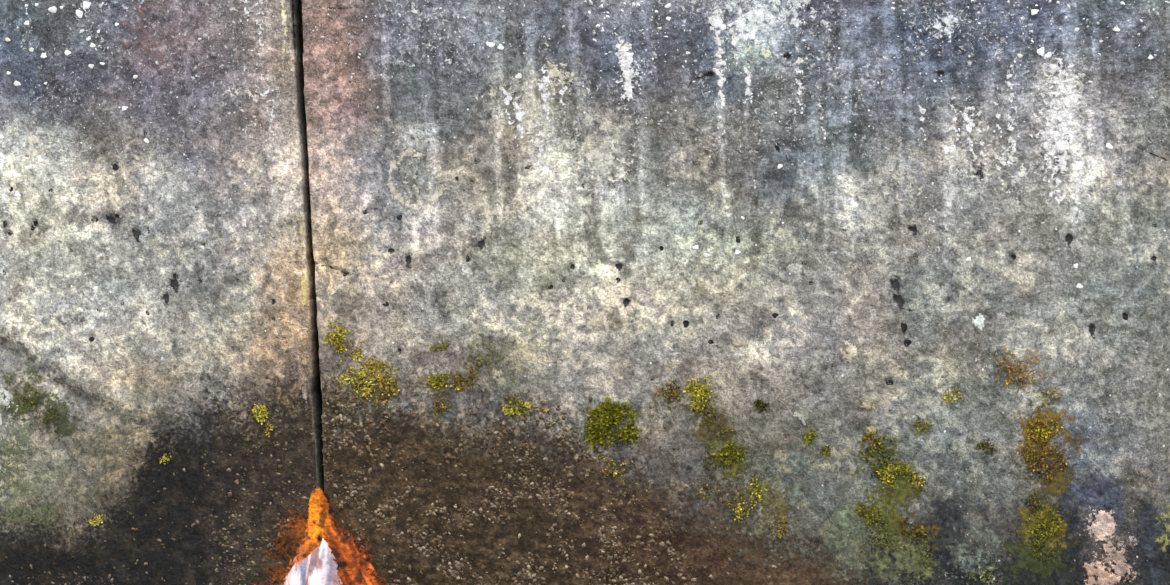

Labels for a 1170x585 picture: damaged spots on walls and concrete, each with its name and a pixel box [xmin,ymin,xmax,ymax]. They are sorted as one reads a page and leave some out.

water stain [385,0,447,27]
water stain [614,25,642,110]
water stain [684,0,847,151]
water stain [918,10,971,43]
water stain [475,57,647,204]
water stain [846,52,1105,233]
water stain [0,358,980,585]
rust [252,487,390,585]
water stain [1001,478,1170,585]